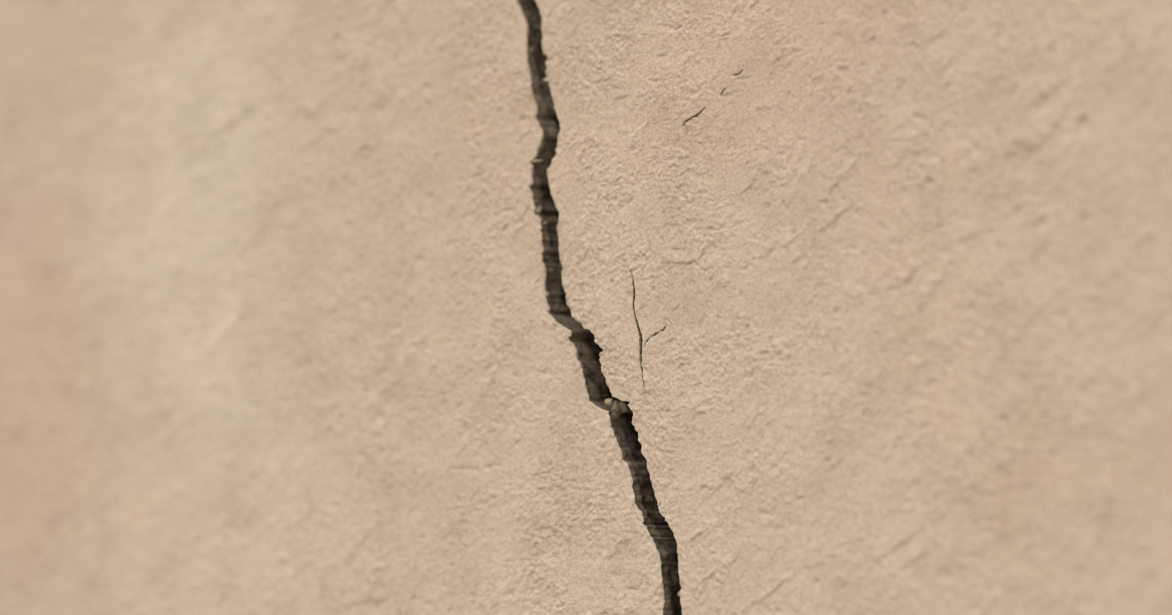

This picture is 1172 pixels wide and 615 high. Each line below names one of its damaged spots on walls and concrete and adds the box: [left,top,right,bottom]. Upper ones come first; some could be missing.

crack [518,0,682,615]